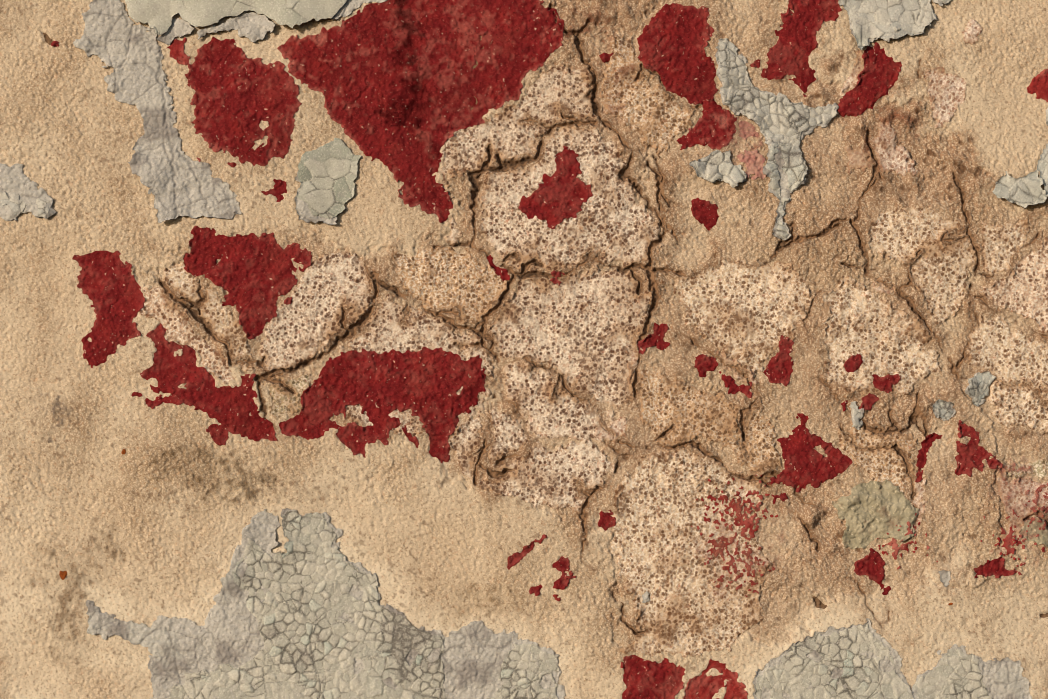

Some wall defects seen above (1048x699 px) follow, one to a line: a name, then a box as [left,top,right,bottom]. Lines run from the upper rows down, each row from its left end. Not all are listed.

peeling [73,0,387,223]
peeling [715,0,952,241]
crack [159,4,685,485]
spalling [139,35,788,658]
crack [578,426,819,552]
crack [689,337,756,443]
spalling [661,143,1048,556]
crack [820,378,928,508]
crack [770,130,993,379]
peeling [86,508,565,699]
crack [612,593,644,635]
peeling [753,618,1032,699]